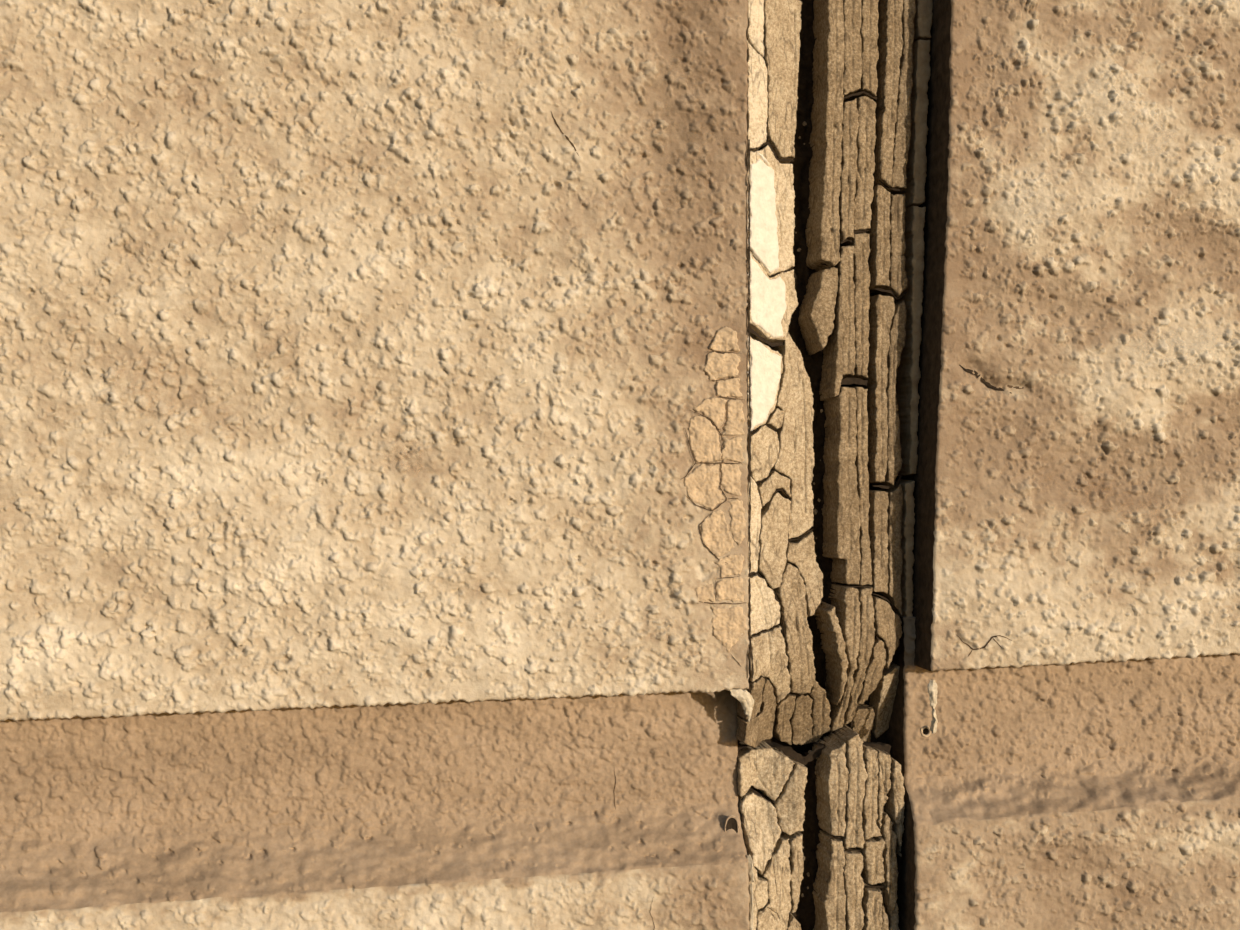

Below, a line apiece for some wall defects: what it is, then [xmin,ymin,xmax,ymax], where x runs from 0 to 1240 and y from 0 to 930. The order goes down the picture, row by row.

crack [680,0,907,930]